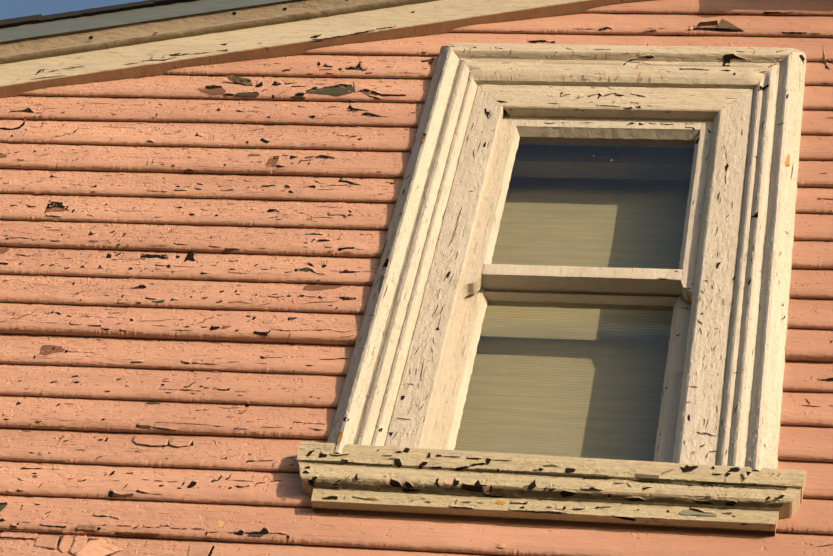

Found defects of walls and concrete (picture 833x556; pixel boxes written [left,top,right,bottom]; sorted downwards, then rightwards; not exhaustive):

peeling [689,19,744,32]
peeling [276,60,389,117]
peeling [560,91,646,108]
peeling [33,336,80,358]
peeling [133,423,194,447]
peeling [455,461,527,492]
peeling [609,469,673,500]
peeling [0,465,123,556]
peeling [509,501,568,514]
peeling [667,506,717,516]